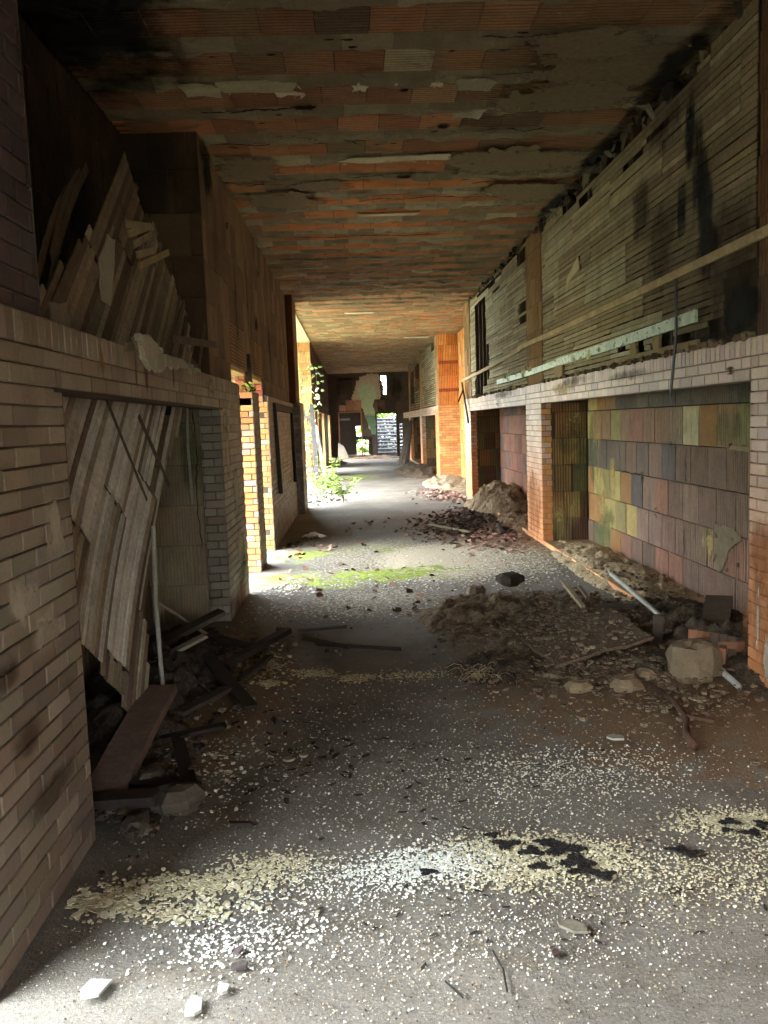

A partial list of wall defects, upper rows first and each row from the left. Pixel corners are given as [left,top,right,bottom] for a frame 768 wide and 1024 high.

peeling [430,78,497,92]
peeling [432,109,486,132]
water stain [650,95,750,309]
spalling [133,333,201,376]
flaking render [351,373,381,435]